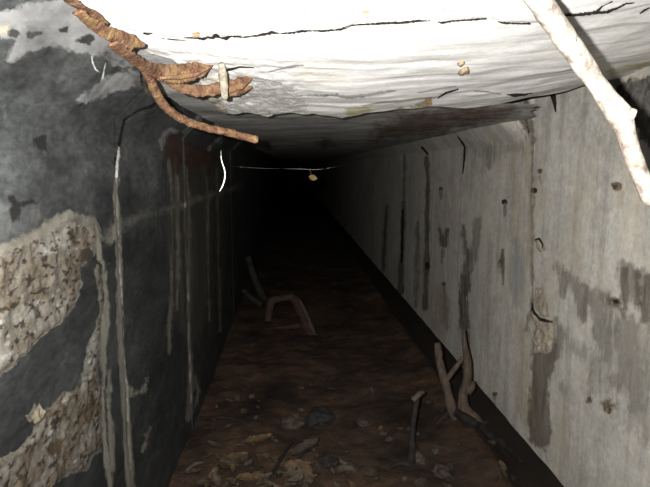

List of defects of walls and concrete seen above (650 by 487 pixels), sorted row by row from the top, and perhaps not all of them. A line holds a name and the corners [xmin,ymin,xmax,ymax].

crack [143,9,531,41]
crack [565,1,650,17]
crack [114,71,166,165]
spalling [0,210,115,487]
leakage [108,146,148,487]
leakage [165,158,243,422]
leakage [398,155,406,294]
leakage [414,146,430,311]
leakage [459,218,480,354]
leakage [527,319,567,448]
leakage [557,260,650,439]